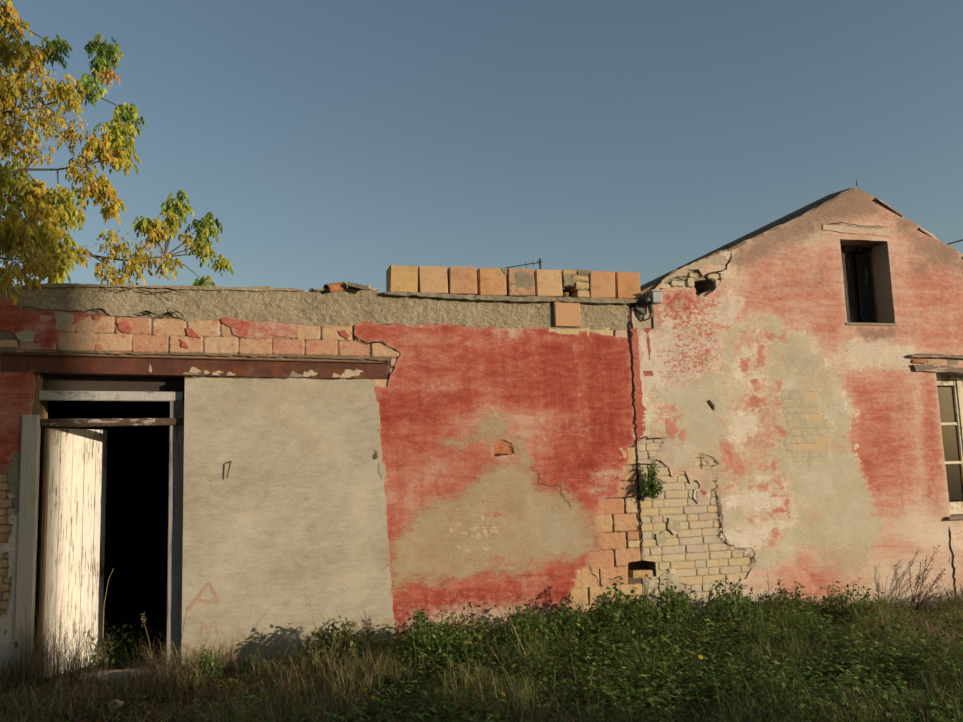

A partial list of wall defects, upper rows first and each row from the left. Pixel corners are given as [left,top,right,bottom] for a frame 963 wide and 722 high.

crack [16,287,189,319]
crack [675,251,732,281]
spalling [0,310,400,387]
peeling [386,250,916,635]
spalling [0,452,21,683]
crack [949,527,957,595]